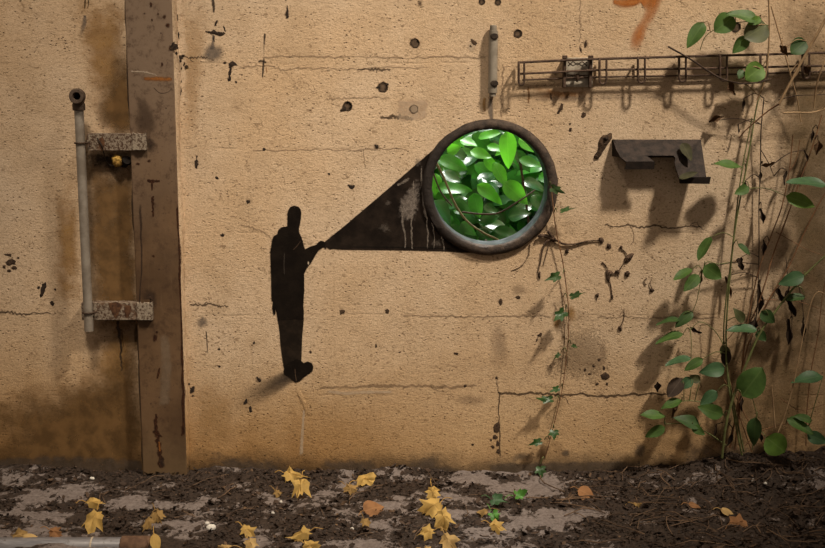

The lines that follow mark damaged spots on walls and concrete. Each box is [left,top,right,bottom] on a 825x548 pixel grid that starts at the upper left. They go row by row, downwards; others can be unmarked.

damp [83,0,130,132]
damp [60,215,75,290]
damp [89,154,136,301]
rust [108,210,154,319]
crack [605,222,702,243]
rust [176,207,186,436]
damp [0,320,142,472]
rust [153,414,164,468]
crack [496,378,667,455]